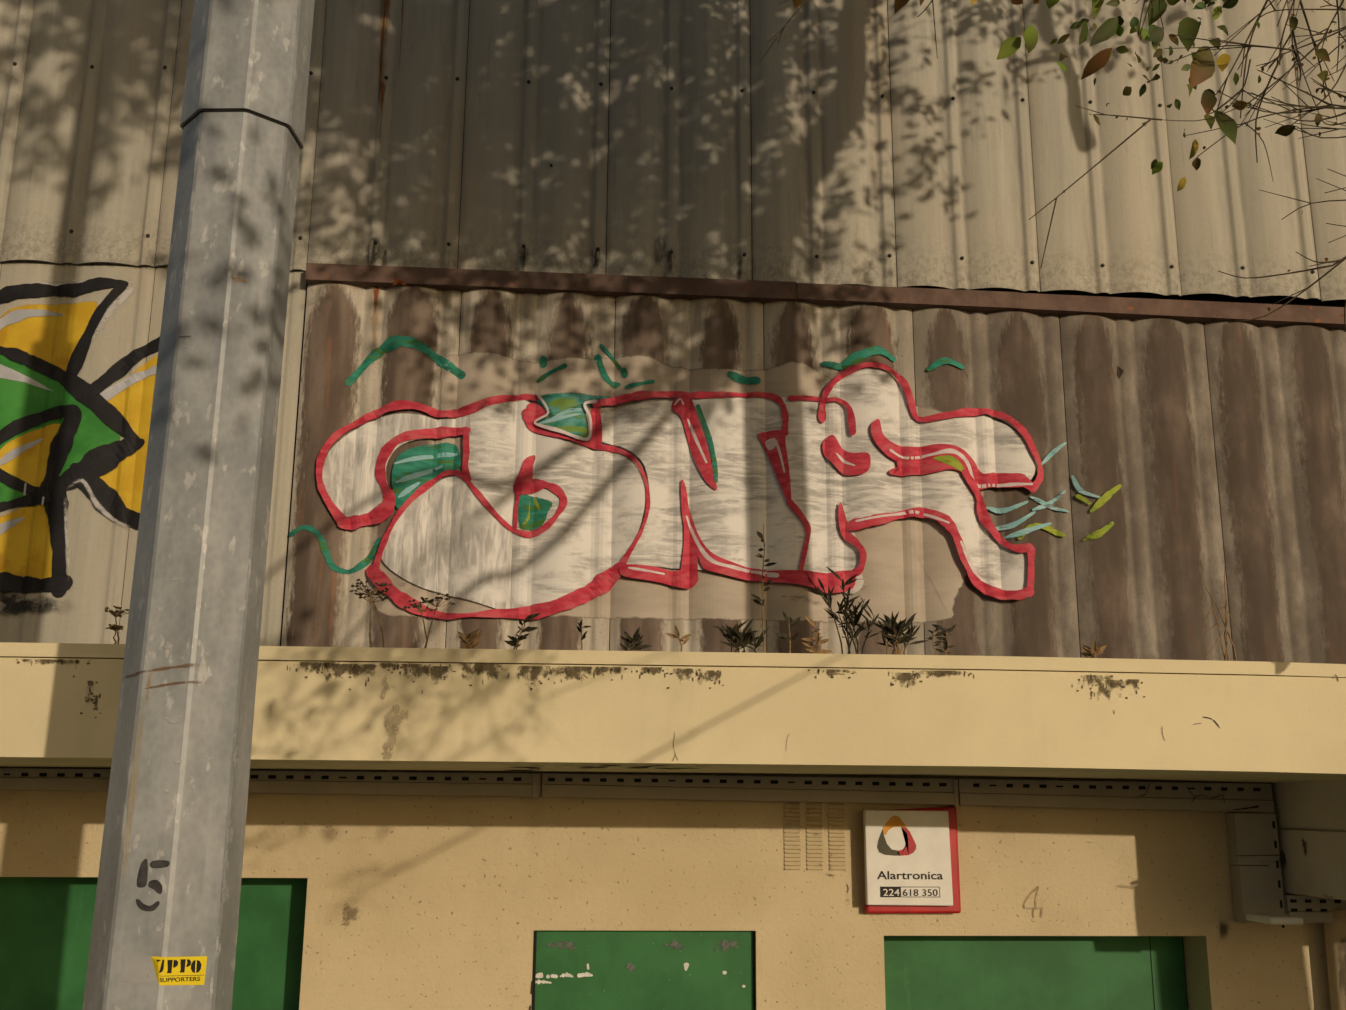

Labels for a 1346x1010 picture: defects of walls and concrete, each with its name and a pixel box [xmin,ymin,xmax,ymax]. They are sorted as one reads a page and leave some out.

leakage [891,670,972,687]